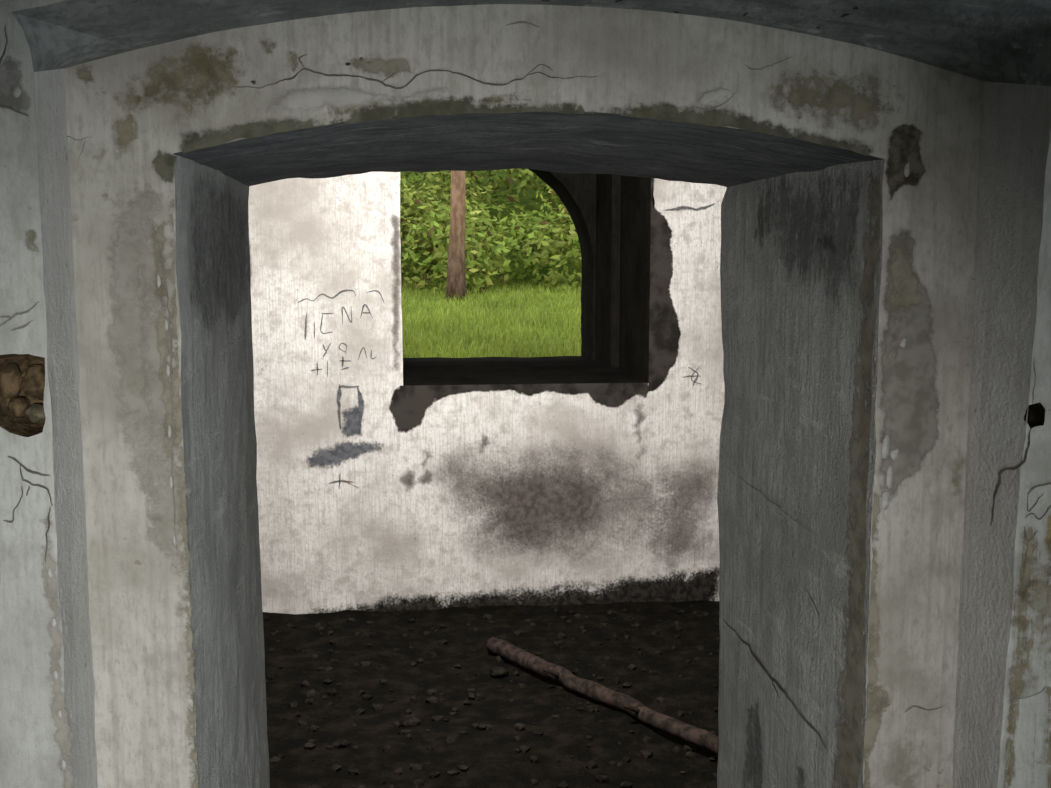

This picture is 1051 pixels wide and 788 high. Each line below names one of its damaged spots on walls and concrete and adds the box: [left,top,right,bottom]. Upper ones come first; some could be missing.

spalling [0,25,30,116]
spalling [346,57,411,77]
crack [232,54,598,89]
spalling [885,124,925,199]
spalling [389,178,715,432]
spalling [0,354,49,437]
spalling [880,231,939,510]
crack [990,430,1051,583]
crack [724,621,826,748]